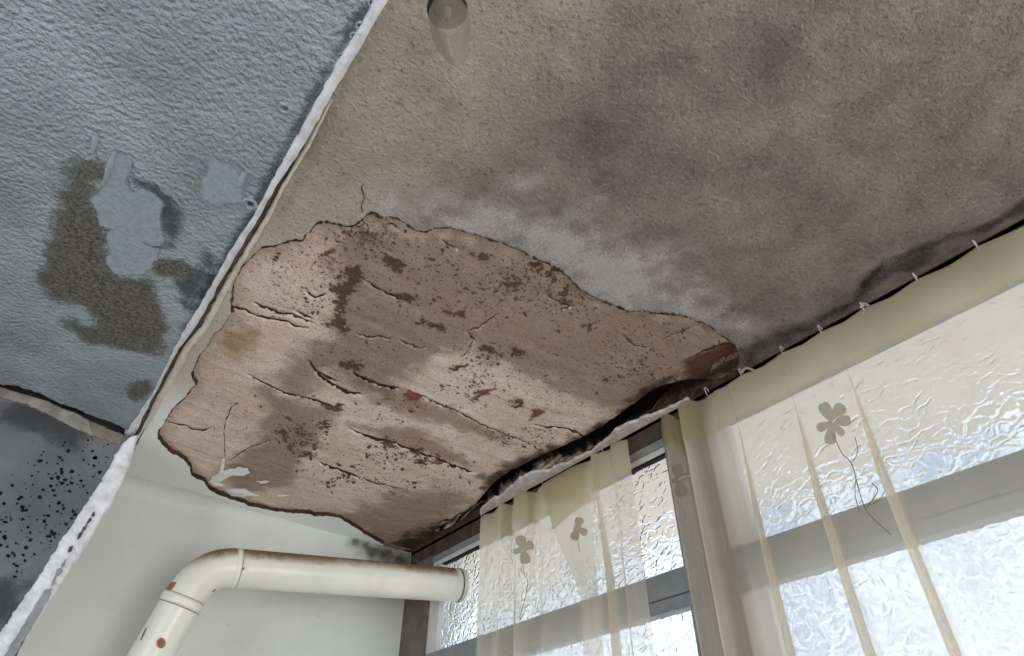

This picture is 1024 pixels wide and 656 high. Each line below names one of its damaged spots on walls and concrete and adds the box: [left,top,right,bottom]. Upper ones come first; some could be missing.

damp [36,157,216,356]
peeling [89,152,165,275]
peeling [199,158,250,208]
damp [444,208,709,318]
damp [821,201,1024,319]
damp [126,380,152,402]
flaking render [157,211,740,550]
damp [0,437,109,578]